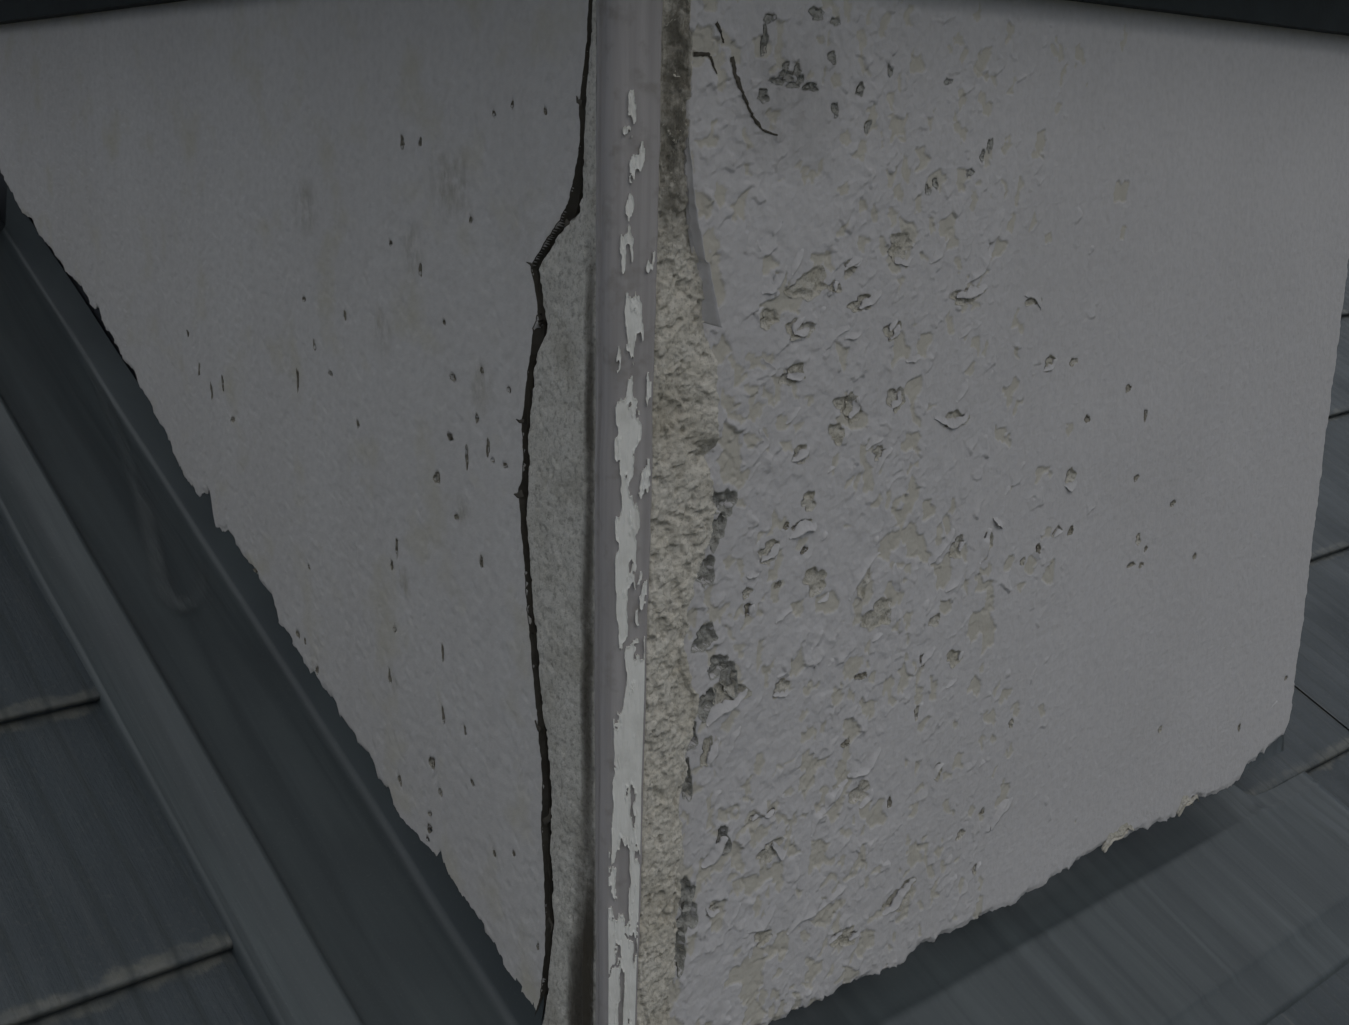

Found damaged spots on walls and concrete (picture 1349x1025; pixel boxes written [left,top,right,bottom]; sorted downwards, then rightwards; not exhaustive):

peeling [760,13,777,57]
peeling [808,6,841,26]
crack [693,21,778,136]
peeling [757,61,819,104]
peeling [967,138,993,177]
peeling [754,249,882,353]
peeling [828,392,863,446]
crack [514,0,593,1021]
spalling [608,0,752,1025]
peeling [742,491,829,617]
peeling [1020,525,1074,566]
peeling [860,563,902,642]